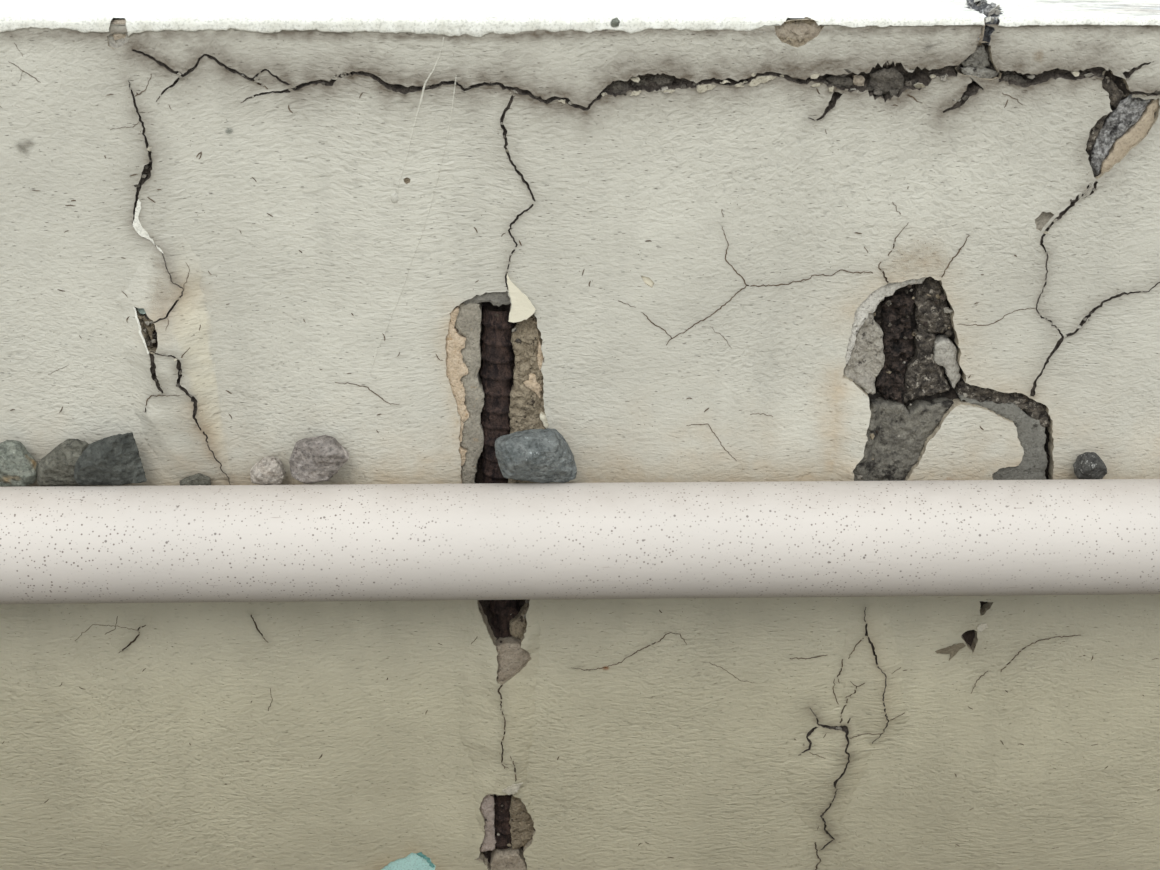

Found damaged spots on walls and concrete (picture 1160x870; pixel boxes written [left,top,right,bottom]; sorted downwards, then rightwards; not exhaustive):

spalling [1086,69,1160,179]
crack [112,0,1160,484]
spalling [133,306,158,354]
spalling [445,274,549,484]
spalling [842,276,1054,481]
spalling [477,600,531,685]
crack [790,607,904,870]
peeling [381,852,435,870]
spalling [475,782,536,870]